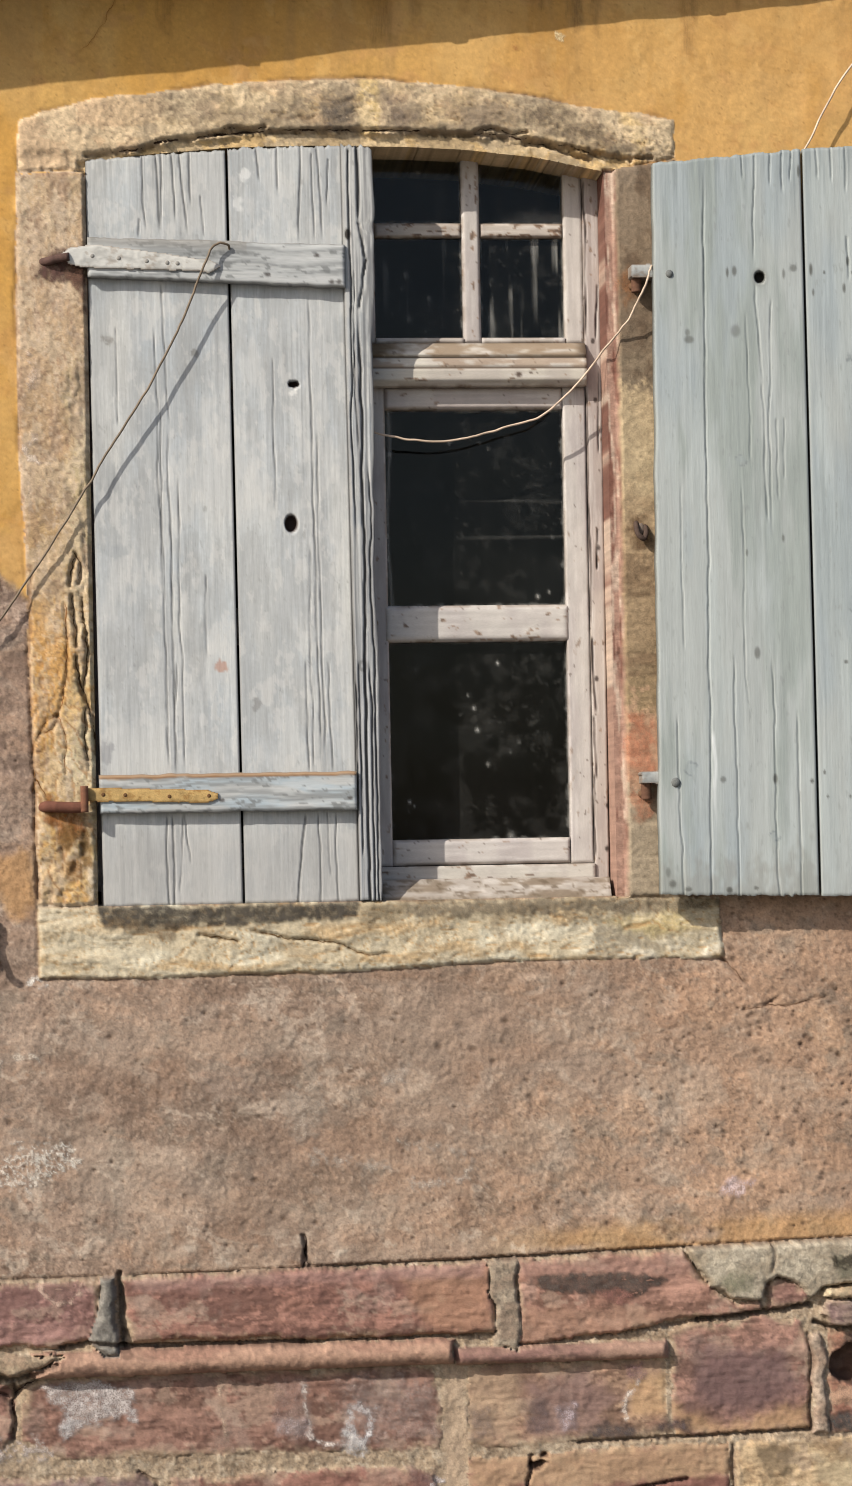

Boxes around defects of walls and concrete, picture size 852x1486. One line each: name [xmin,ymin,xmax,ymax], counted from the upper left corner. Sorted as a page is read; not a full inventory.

crack [203,930,381,956]
flaking render [0,573,852,1307]
crack [0,1380,35,1430]
leakage [42,1381,137,1438]